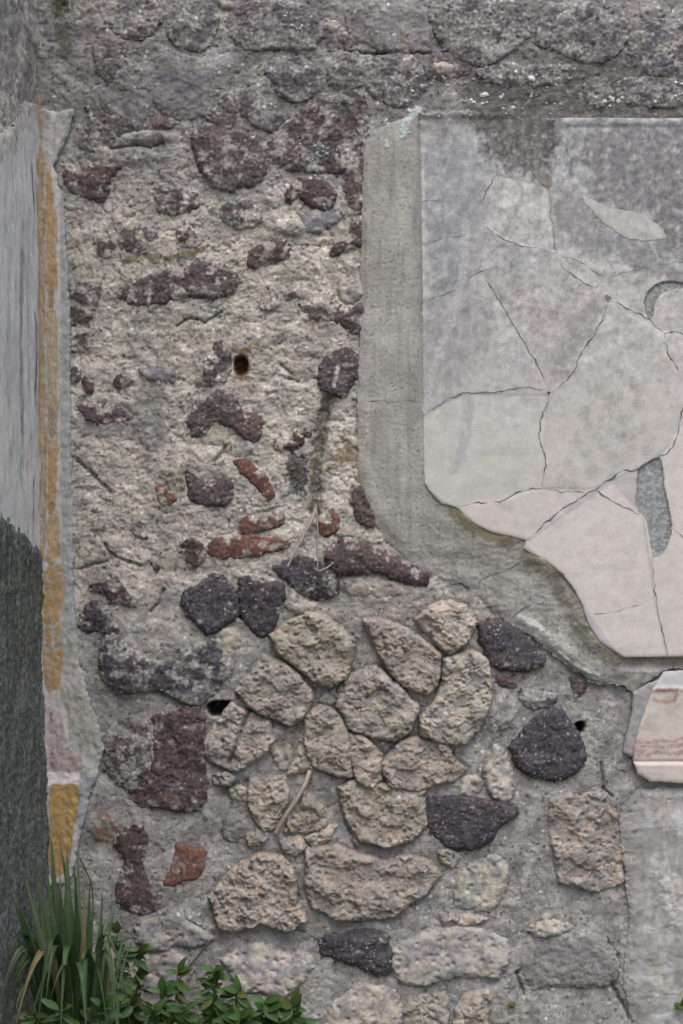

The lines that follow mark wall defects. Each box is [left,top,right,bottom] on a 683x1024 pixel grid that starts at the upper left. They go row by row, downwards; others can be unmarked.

crack [364,176,683,533]
flaking render [635,457,672,557]
crack [595,561,668,654]